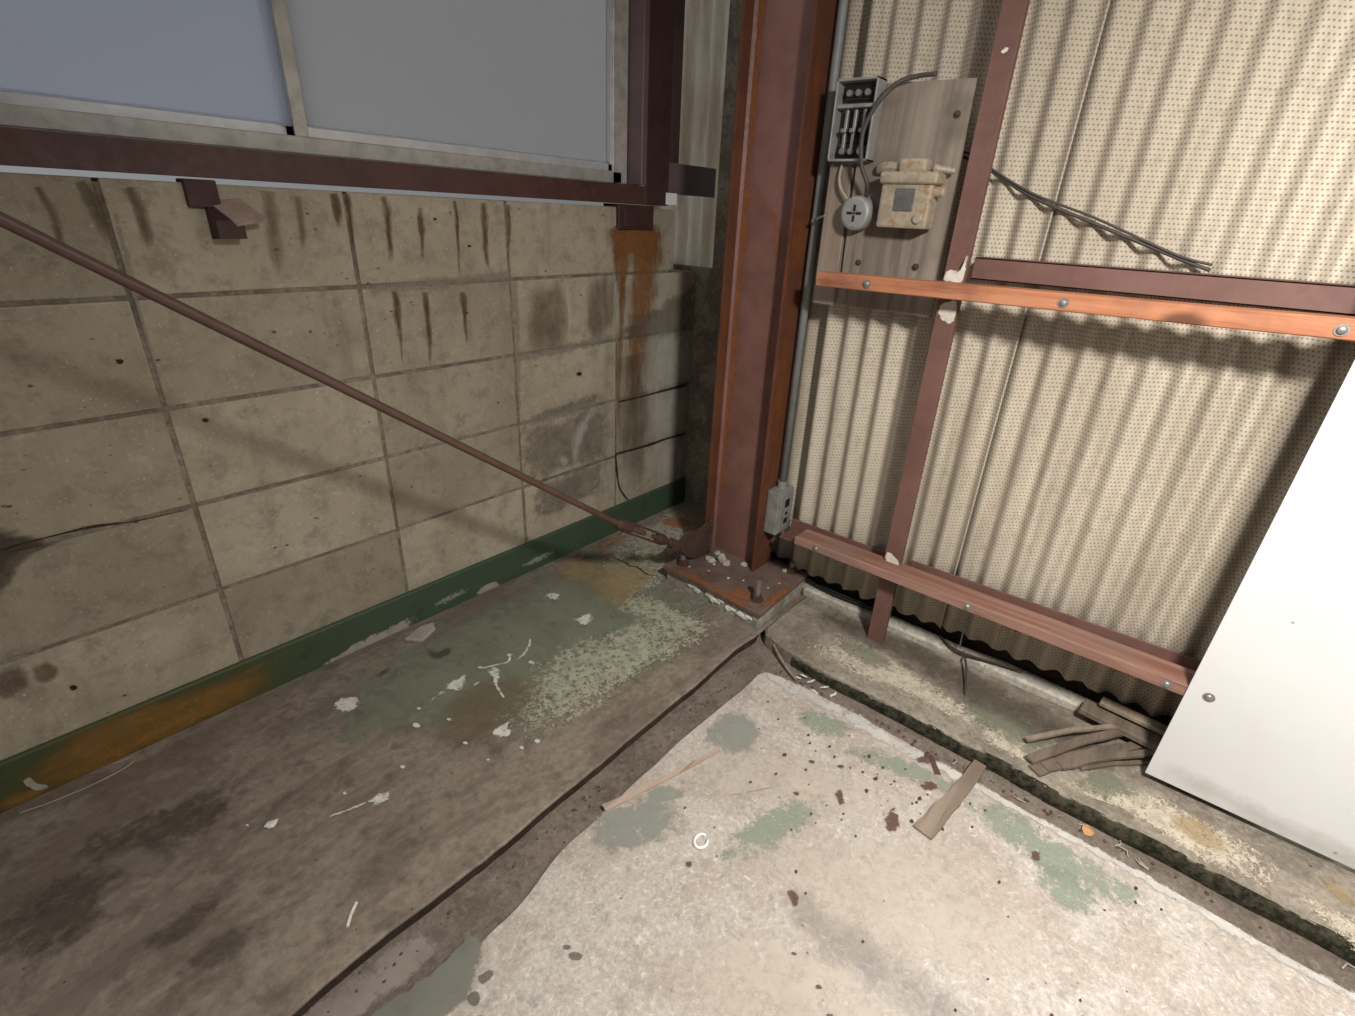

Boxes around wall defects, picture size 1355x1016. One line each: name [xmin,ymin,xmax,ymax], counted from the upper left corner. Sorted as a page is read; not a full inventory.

leakage [129,187,149,239]
leakage [331,193,353,244]
leakage [383,200,392,249]
rust [719,0,809,492]
rust [612,226,662,398]
leakage [0,534,46,588]
rust [679,570,793,608]
rust [3,668,258,807]